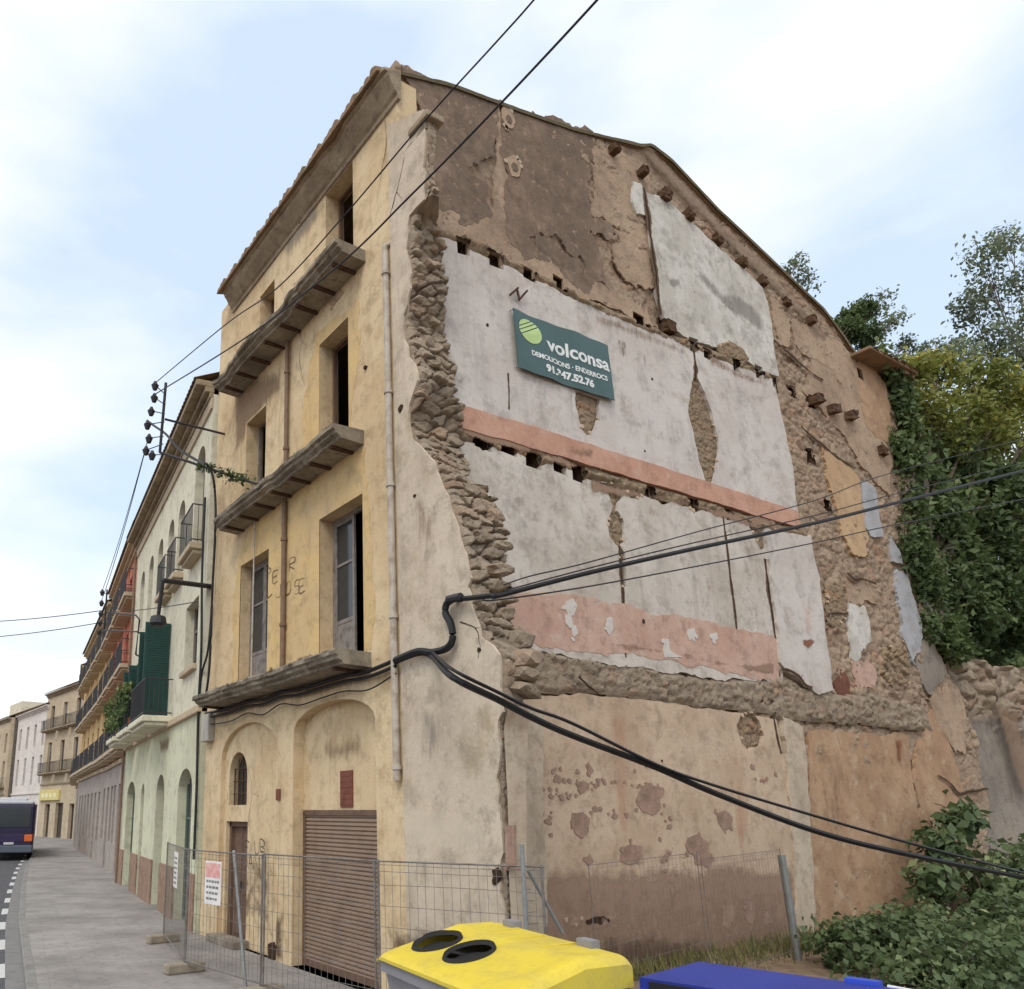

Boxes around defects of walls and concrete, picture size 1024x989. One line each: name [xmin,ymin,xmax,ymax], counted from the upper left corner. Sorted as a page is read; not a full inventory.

peeling [503,155,523,178]
crack [643,187,662,316]
spalling [688,379,719,482]
peeling [562,599,578,642]
spalling [823,582,848,632]
peeling [661,639,682,660]
spalling [879,640,915,691]
spalling [736,711,763,749]
peeling [543,762,679,894]
peeling [685,832,715,867]
peeling [714,808,733,834]
leakage [547,867,795,969]